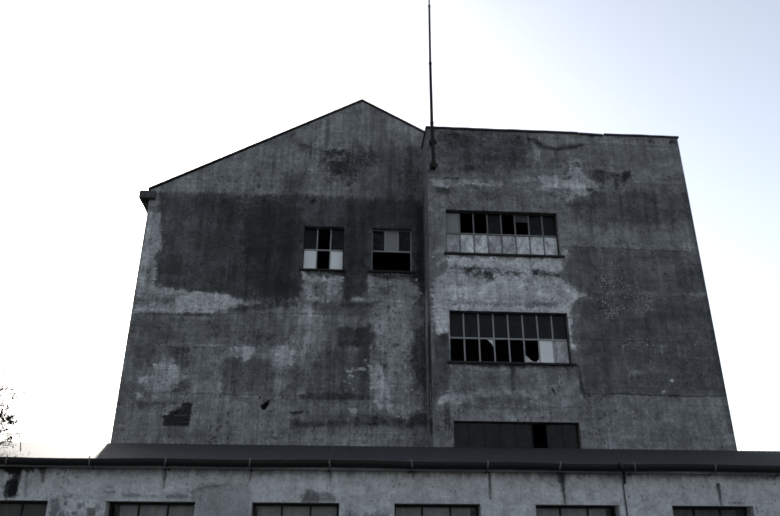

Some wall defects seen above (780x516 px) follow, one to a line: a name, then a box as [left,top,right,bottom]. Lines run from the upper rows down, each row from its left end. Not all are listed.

peeling [133,211,268,314]
peeling [270,271,344,368]
peeling [229,346,258,361]
peeling [135,357,193,427]
spalling [241,378,306,412]
damp [0,467,49,498]
peeling [48,491,141,516]